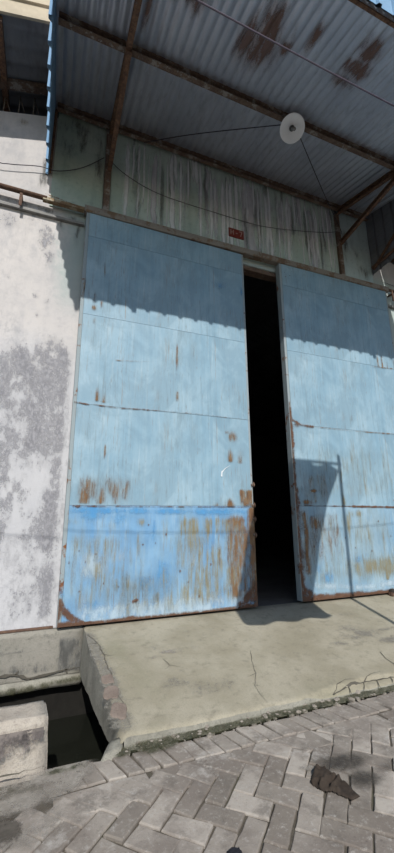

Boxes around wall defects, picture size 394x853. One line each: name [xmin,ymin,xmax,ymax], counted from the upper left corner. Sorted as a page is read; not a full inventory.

corrosion [232,5,291,66]
corrosion [306,23,323,47]
corrosion [334,40,383,87]
corrosion [75,480,184,508]
corrosion [289,402,394,602]
corrosion [57,490,258,628]
crack [333,652,394,695]